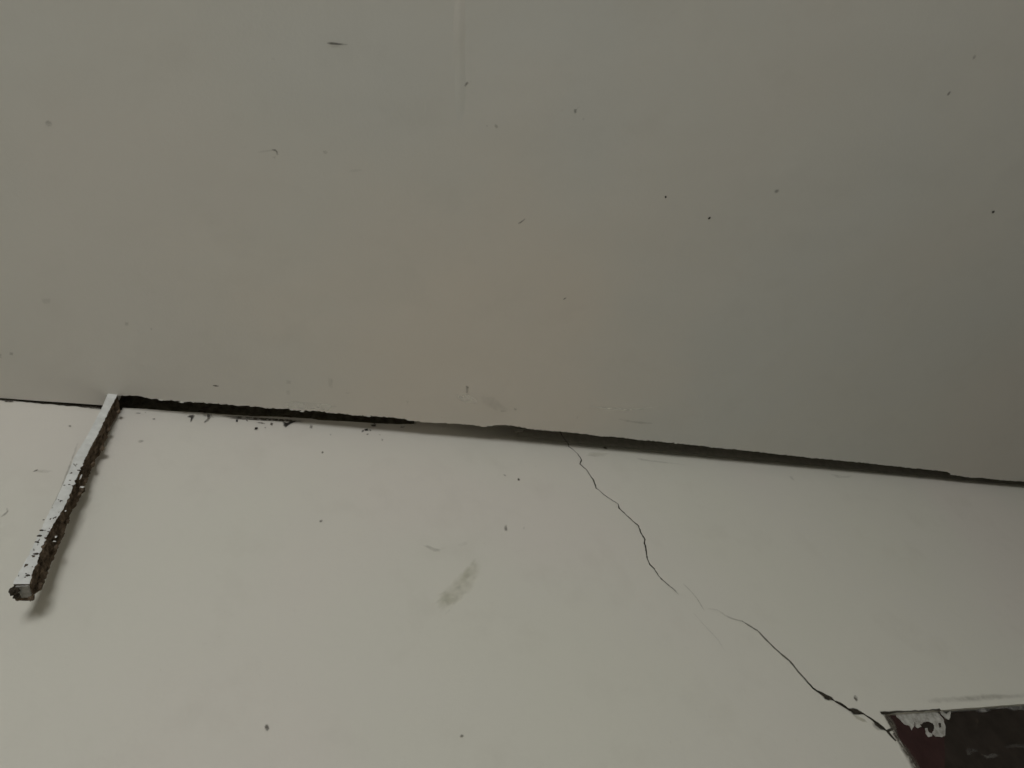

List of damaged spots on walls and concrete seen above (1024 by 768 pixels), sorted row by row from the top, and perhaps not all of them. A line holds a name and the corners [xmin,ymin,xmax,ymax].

crack [560,432,673,589]
peeling [8,586,21,600]
crack [758,631,896,741]
peeling [880,708,951,768]